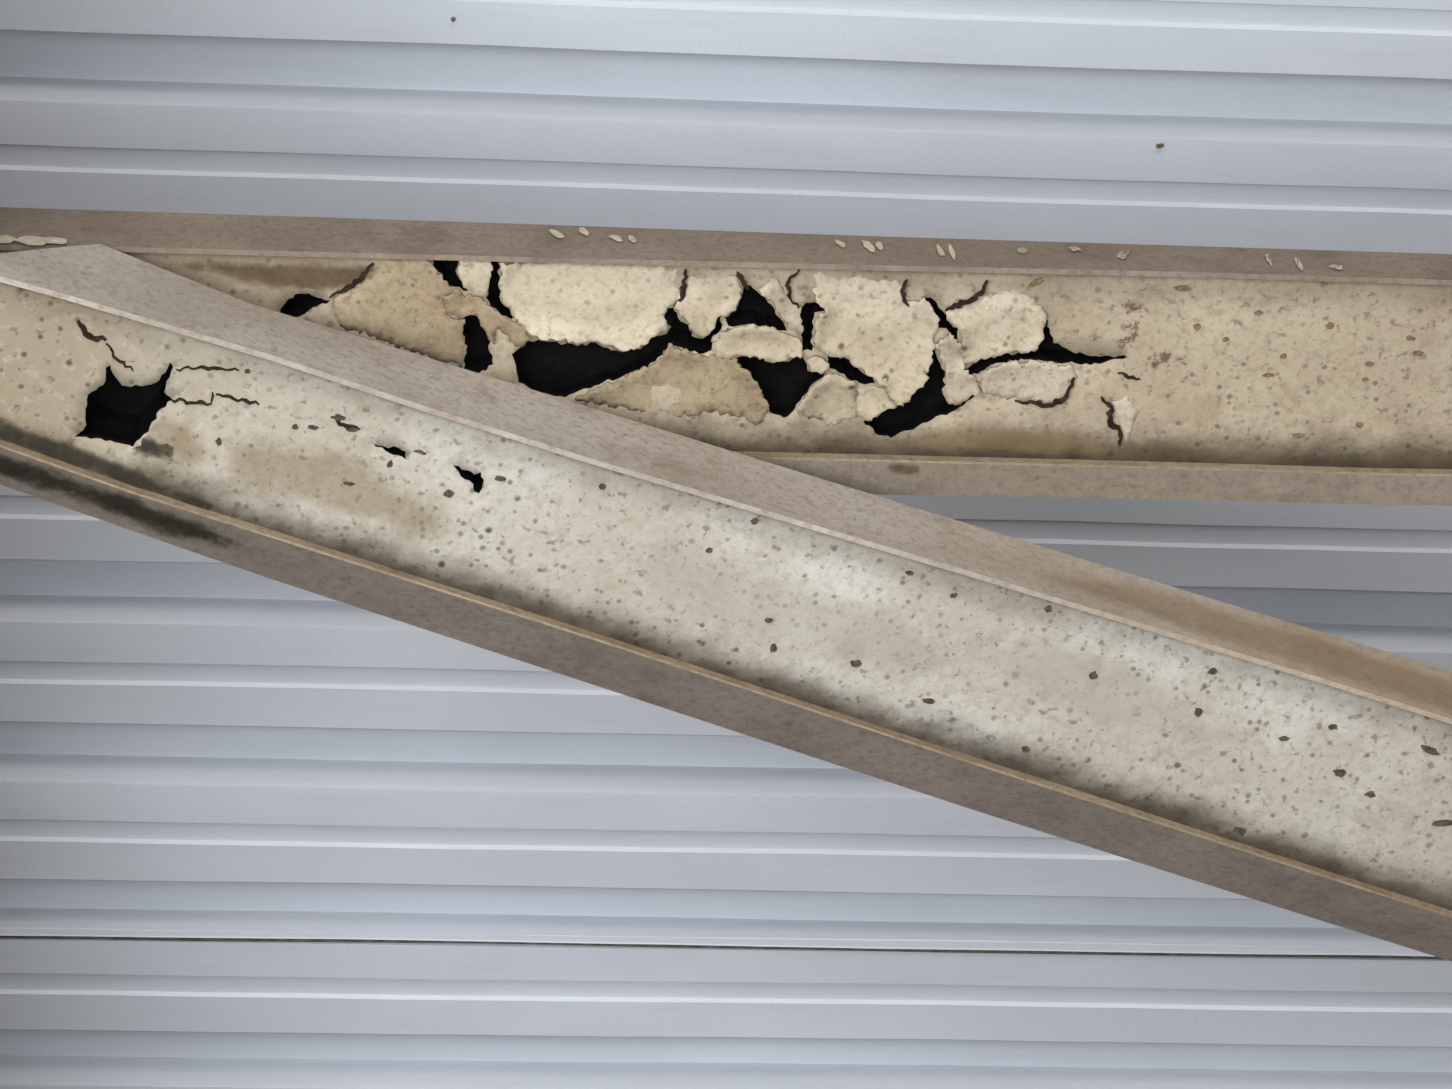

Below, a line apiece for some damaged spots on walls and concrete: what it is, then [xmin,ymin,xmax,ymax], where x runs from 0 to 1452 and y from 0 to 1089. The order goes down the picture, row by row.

peeling [549,227,589,238]
peeling [836,239,883,252]
peeling [936,244,955,259]
crack [77,320,134,371]
peeling [332,259,1078,426]
crack [171,365,259,406]
peeling [1111,396,1140,443]